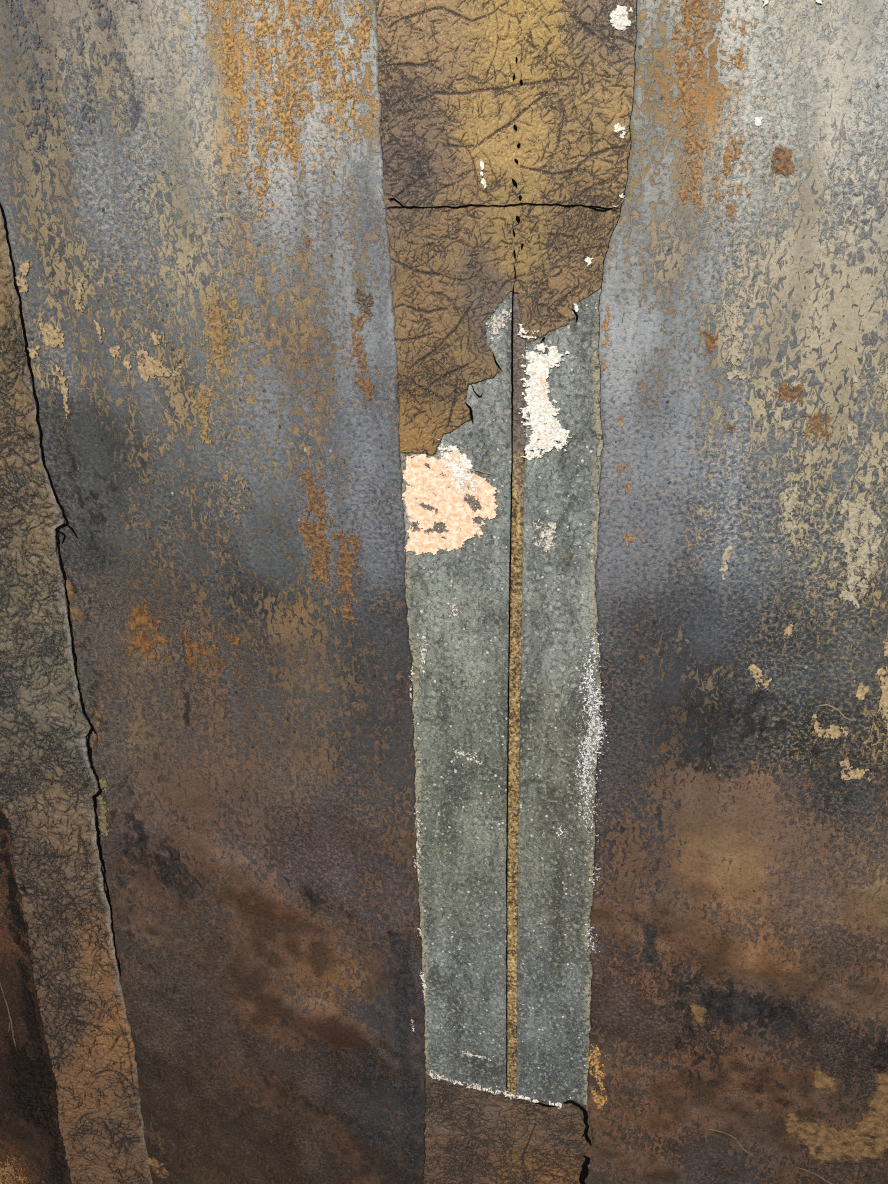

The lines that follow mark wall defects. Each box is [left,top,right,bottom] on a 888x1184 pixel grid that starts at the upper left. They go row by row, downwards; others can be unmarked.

rust [208,0,375,220]
rust [663,0,801,229]
rust [350,312,376,409]
peeling [485,309,572,461]
crack [0,203,121,976]
rust [294,470,363,625]
peeling [402,436,499,555]
crack [388,125,622,1089]
peeling [854,639,888,730]
peeling [840,757,873,782]
crack [0,981,17,1049]
crack [535,1100,591,1184]